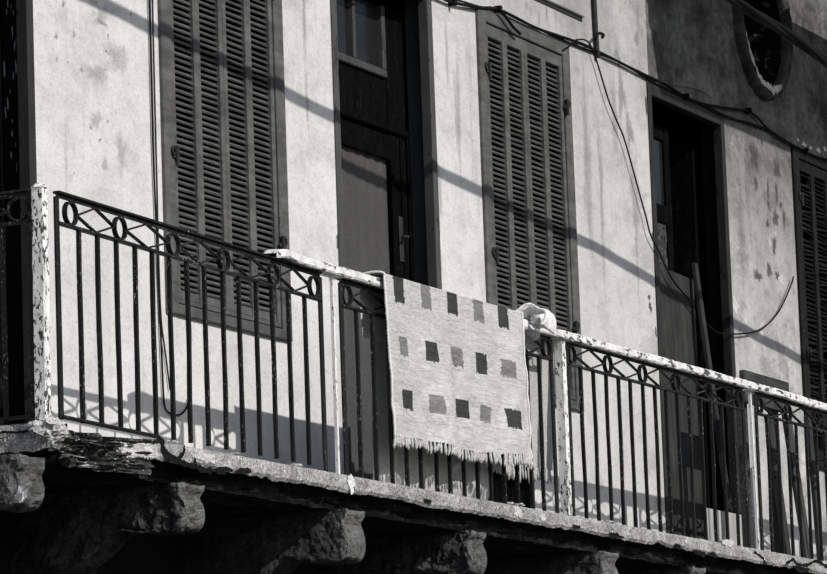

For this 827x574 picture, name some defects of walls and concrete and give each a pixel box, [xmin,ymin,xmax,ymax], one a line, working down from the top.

peeling [746,31,782,95]
spalling [59,423,159,475]
crack [754,550,827,568]